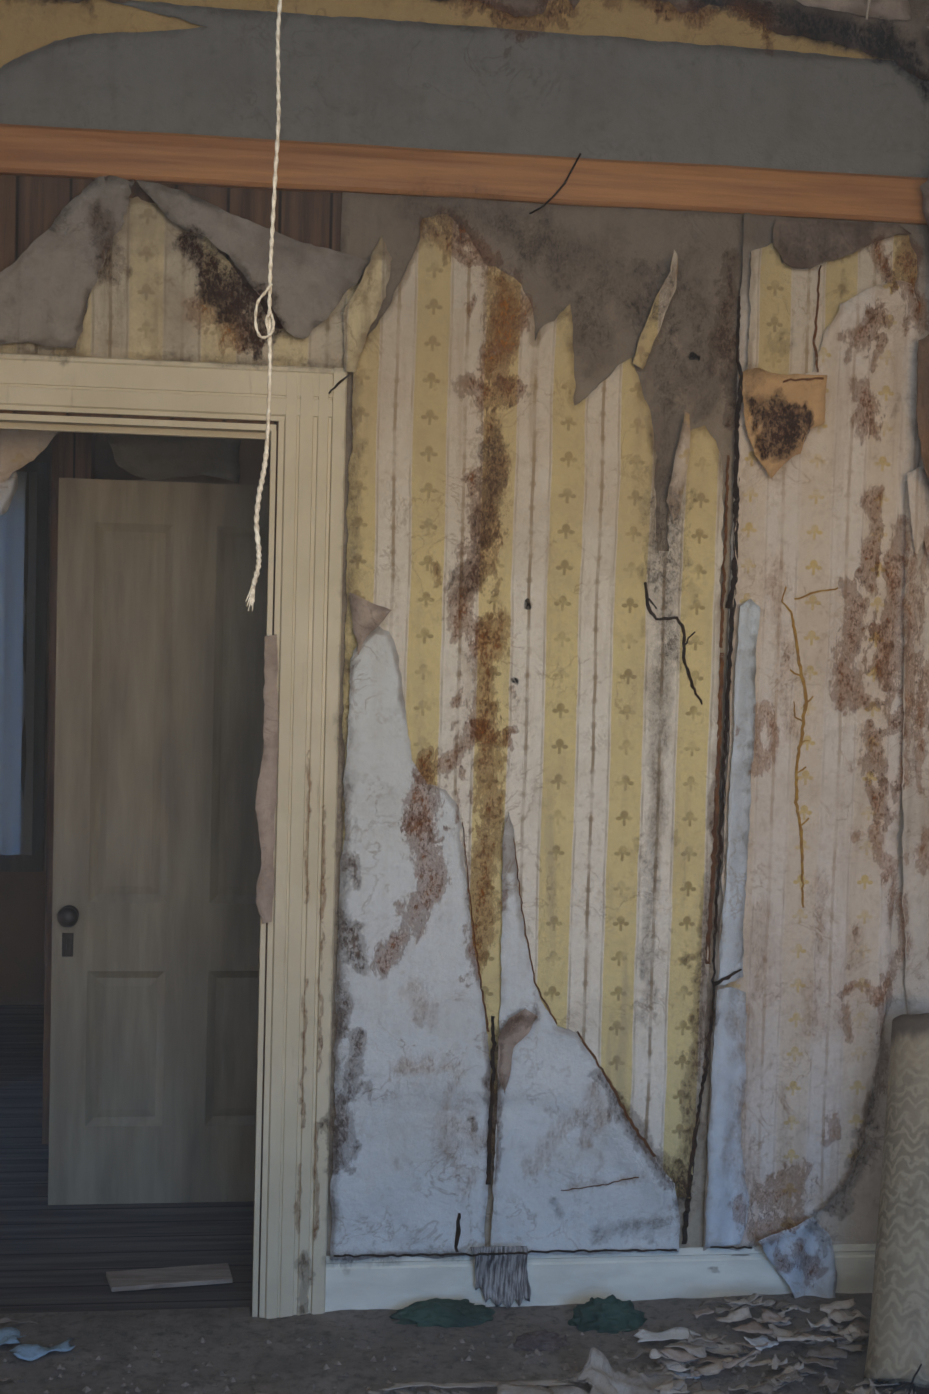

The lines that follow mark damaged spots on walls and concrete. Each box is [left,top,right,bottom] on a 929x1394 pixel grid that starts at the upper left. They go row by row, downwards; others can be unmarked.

damp [176,226,284,360]
damp [709,252,813,460]
damp [339,209,529,975]
crack [334,296,752,1258]
damp [836,489,929,873]